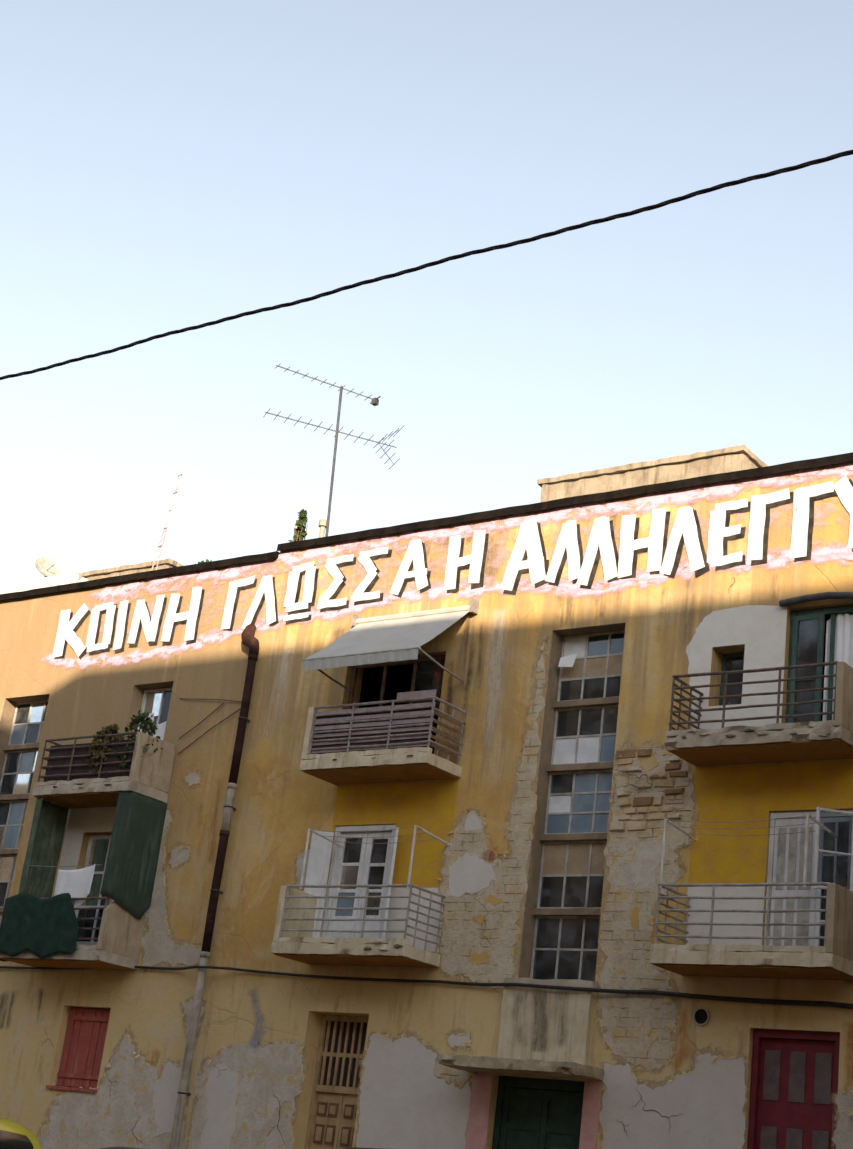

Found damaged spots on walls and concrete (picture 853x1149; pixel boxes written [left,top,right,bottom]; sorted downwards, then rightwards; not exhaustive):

peeling [141,810,209,967]
peeling [436,635,550,990]
spalling [596,741,698,1072]
peeling [38,1026,307,1149]
crack [616,1092,678,1137]
peeling [832,1090,853,1149]